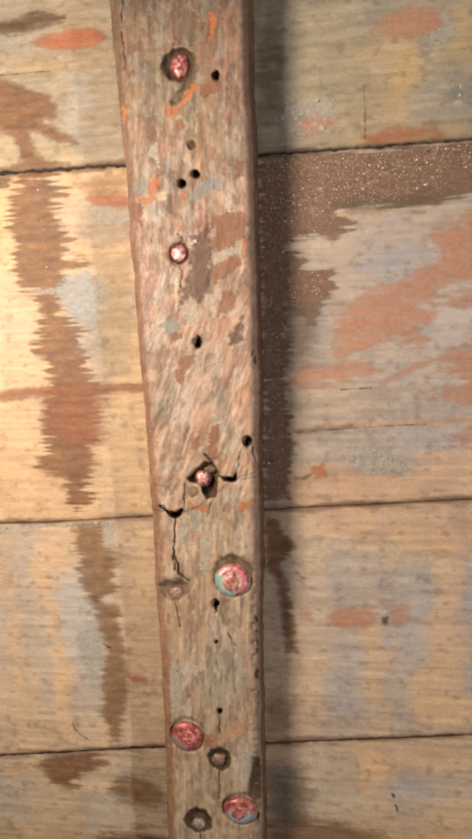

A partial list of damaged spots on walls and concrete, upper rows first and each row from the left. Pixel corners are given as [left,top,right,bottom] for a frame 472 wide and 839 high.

crack [205,447,254,514]
crack [158,501,189,581]